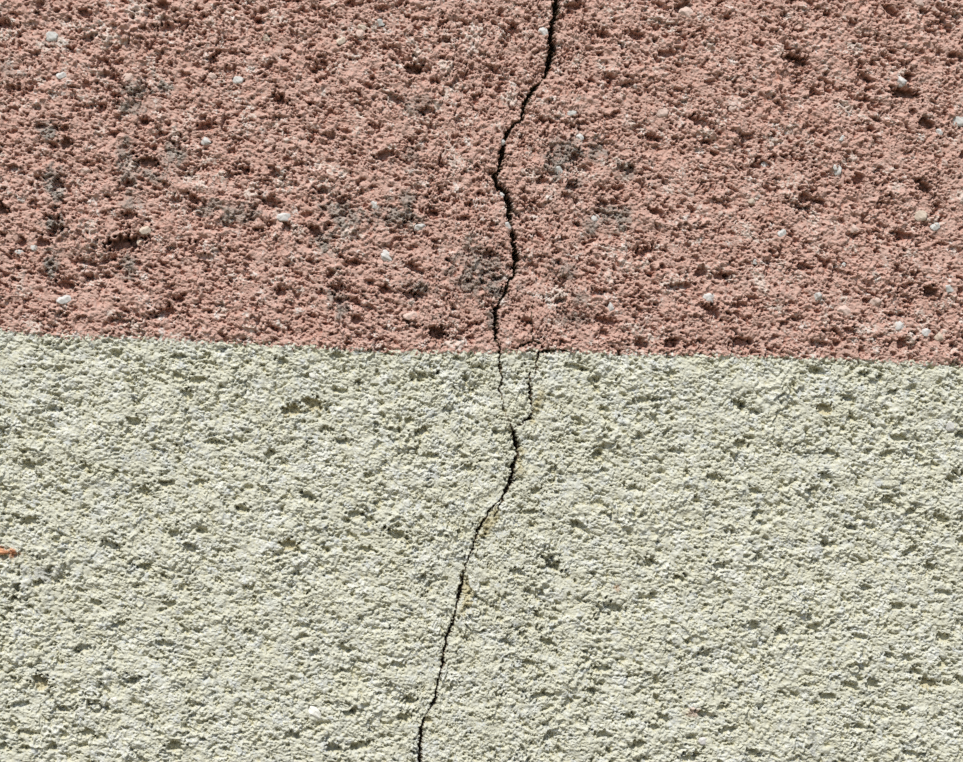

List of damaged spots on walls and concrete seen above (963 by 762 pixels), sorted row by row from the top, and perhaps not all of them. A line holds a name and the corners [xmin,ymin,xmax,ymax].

crack [417,0,572,762]